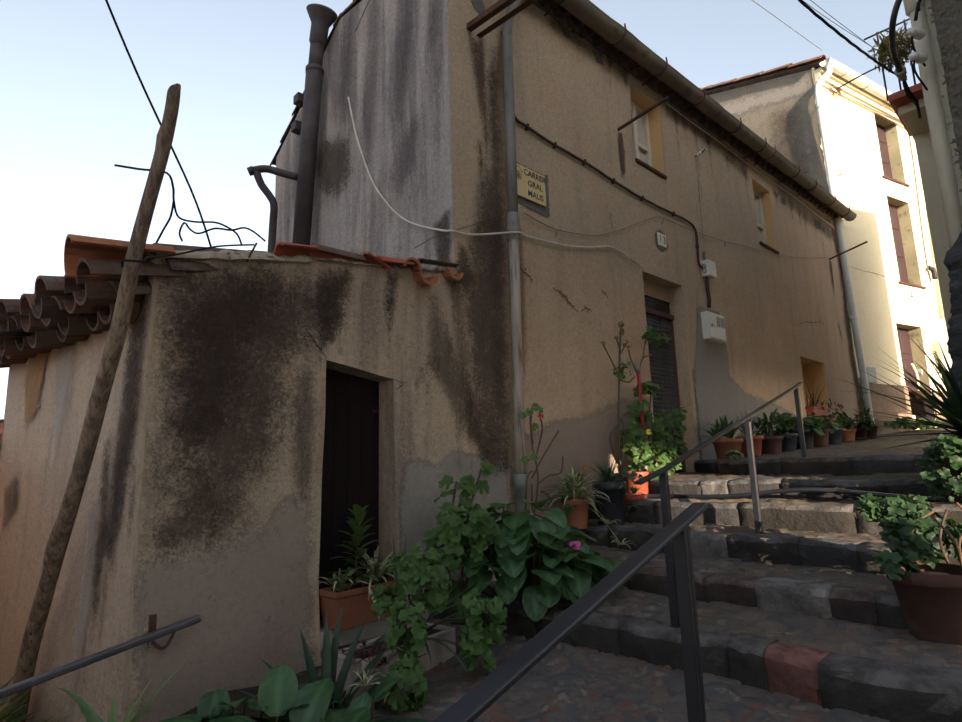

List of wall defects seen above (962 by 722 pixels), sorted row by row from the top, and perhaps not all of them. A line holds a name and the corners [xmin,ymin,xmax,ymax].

leakage [74,295,148,658]
leakage [153,264,349,553]
leakage [316,139,349,198]
leakage [429,51,509,469]